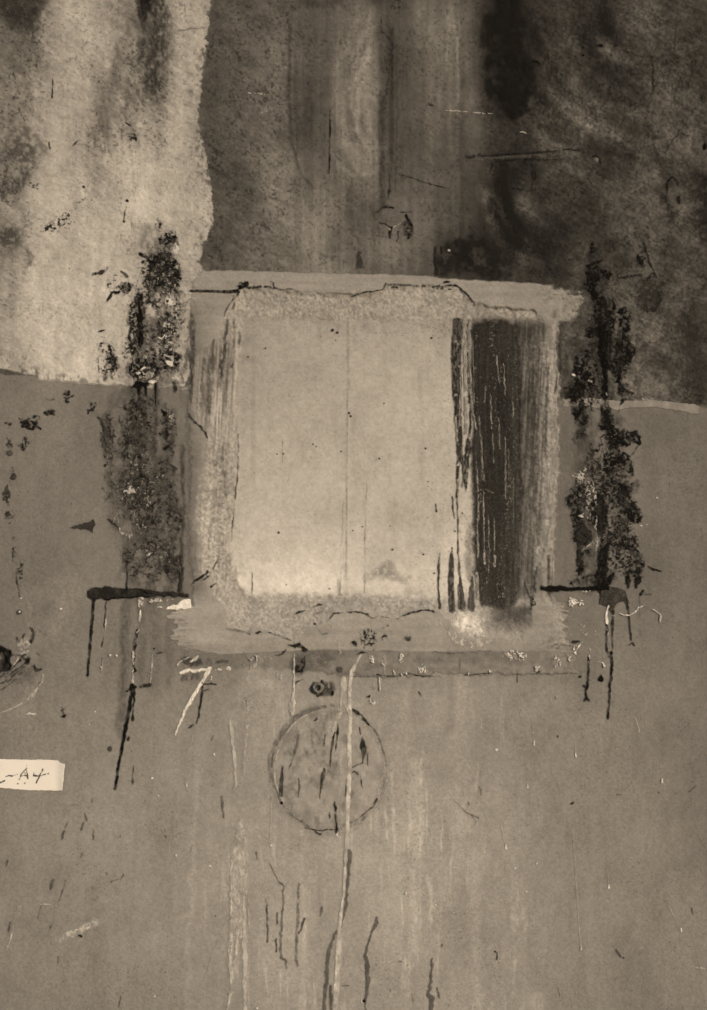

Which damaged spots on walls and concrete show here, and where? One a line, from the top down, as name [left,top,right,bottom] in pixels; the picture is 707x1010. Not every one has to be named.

water stain [138,0,168,95]
water stain [434,235,511,279]
water stain [131,238,177,391]
water stain [437,317,547,648]
water stain [86,598,107,677]
water stain [114,449,185,790]
water stain [583,648,591,702]
water stain [605,605,615,719]
water stain [323,655,362,1010]
water stain [266,884,306,966]
water stain [361,917,378,1010]
water stain [426,958,440,1010]